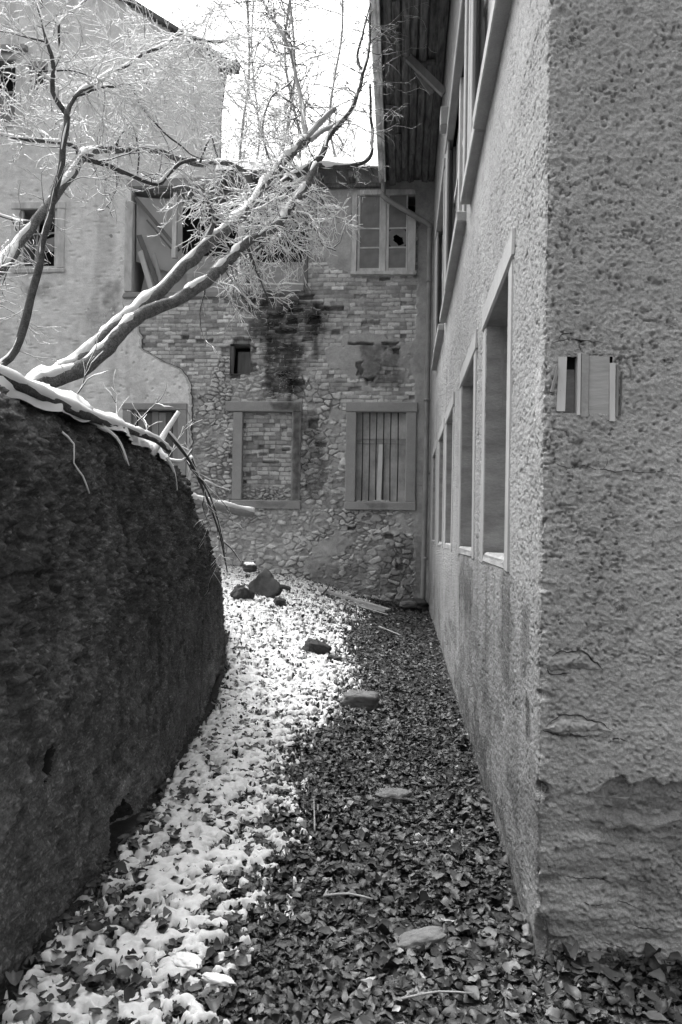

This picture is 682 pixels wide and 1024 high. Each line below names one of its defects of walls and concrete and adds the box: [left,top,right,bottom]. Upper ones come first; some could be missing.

damp [245,294,328,491]
flaking render [586,774,682,827]